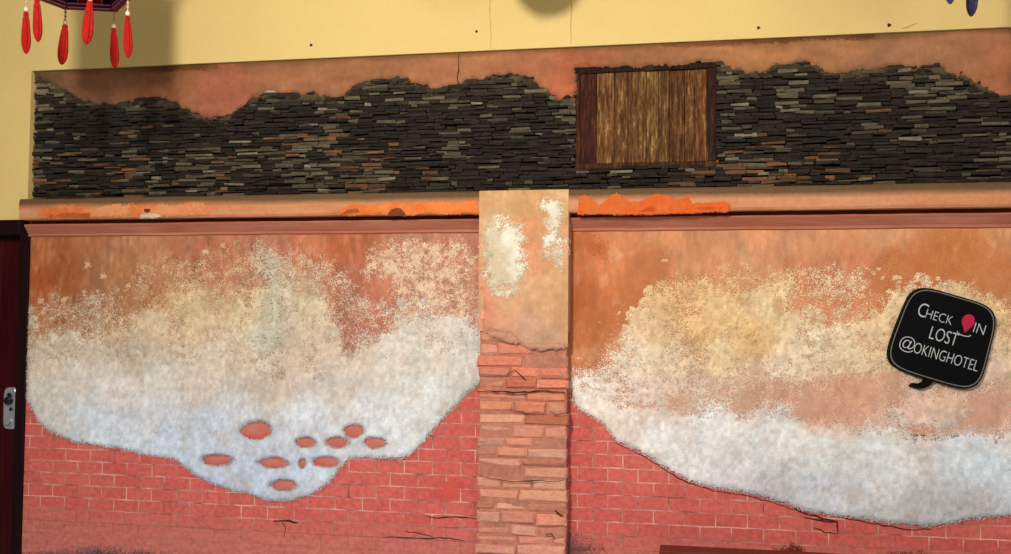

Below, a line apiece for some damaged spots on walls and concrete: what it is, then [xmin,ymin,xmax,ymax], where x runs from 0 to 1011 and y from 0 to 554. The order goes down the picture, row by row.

spalling [32,60,1011,272]
leakage [256,239,295,349]
leakage [606,242,675,334]
peeling [25,213,1011,554]
leakage [22,545,179,554]
crack [383,516,476,541]
leakage [568,527,607,554]